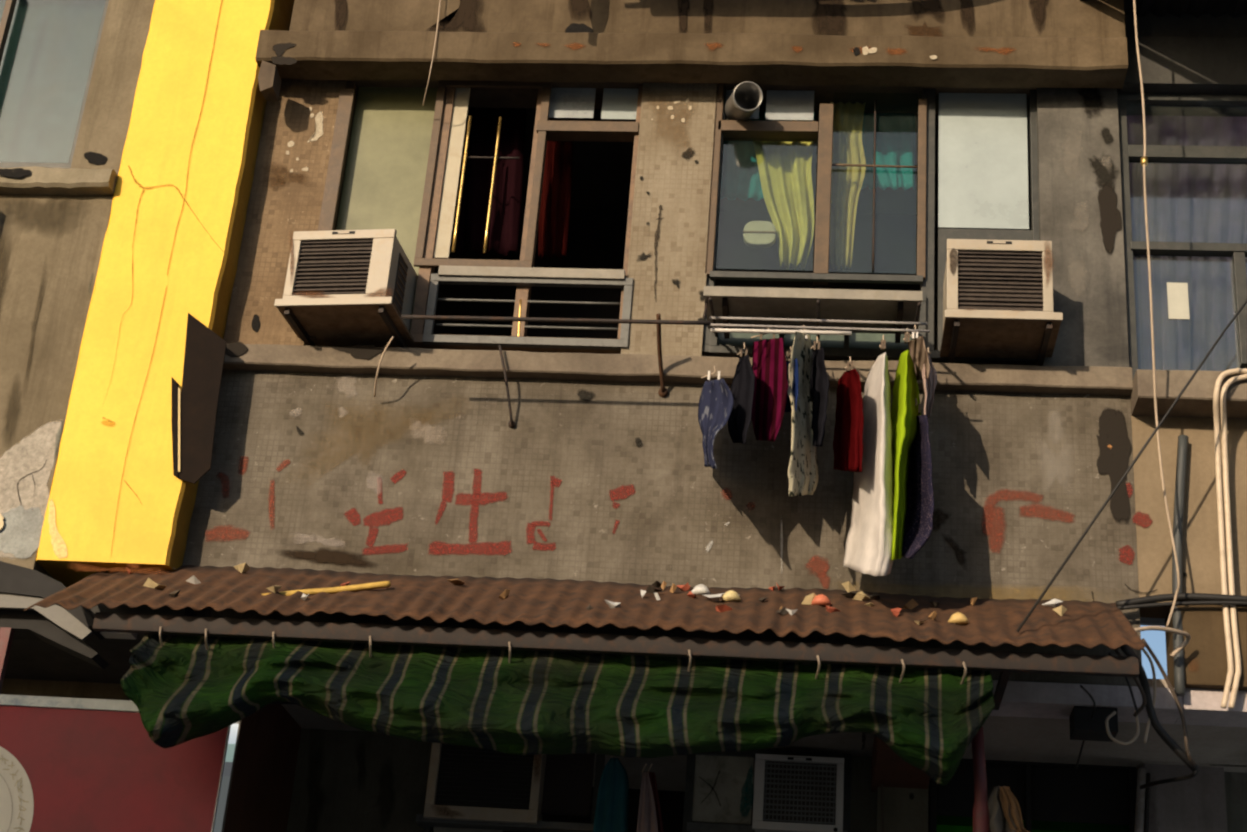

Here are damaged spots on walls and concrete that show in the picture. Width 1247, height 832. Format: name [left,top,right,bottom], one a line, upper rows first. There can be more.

water stain [1078,88,1103,115]
water stain [1090,128,1117,188]
crack [103,0,224,556]
peeling [0,422,152,573]